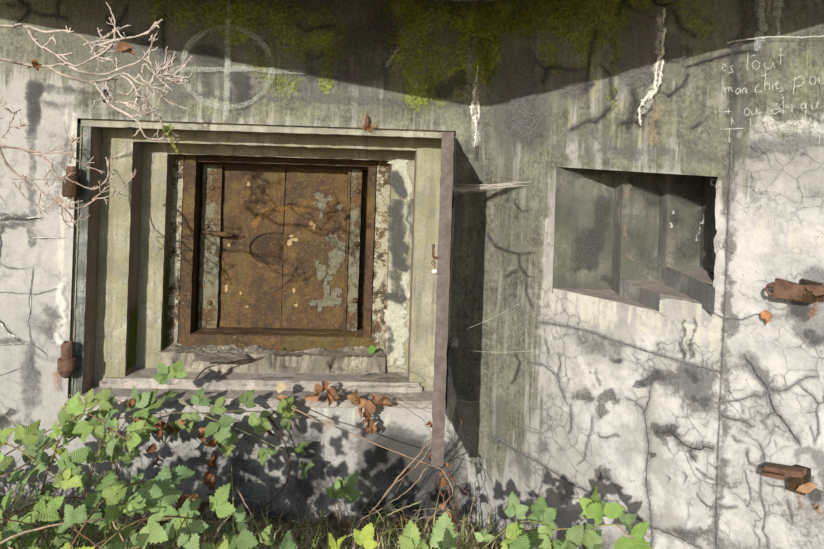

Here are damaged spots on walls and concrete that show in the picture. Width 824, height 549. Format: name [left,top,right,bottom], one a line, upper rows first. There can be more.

water stain [25,82,52,132]
water stain [230,71,250,107]
water stain [437,66,480,161]
water stain [616,8,685,126]
crack [0,198,65,355]
spalling [157,157,413,382]
crack [487,141,824,549]
water stain [363,430,468,517]